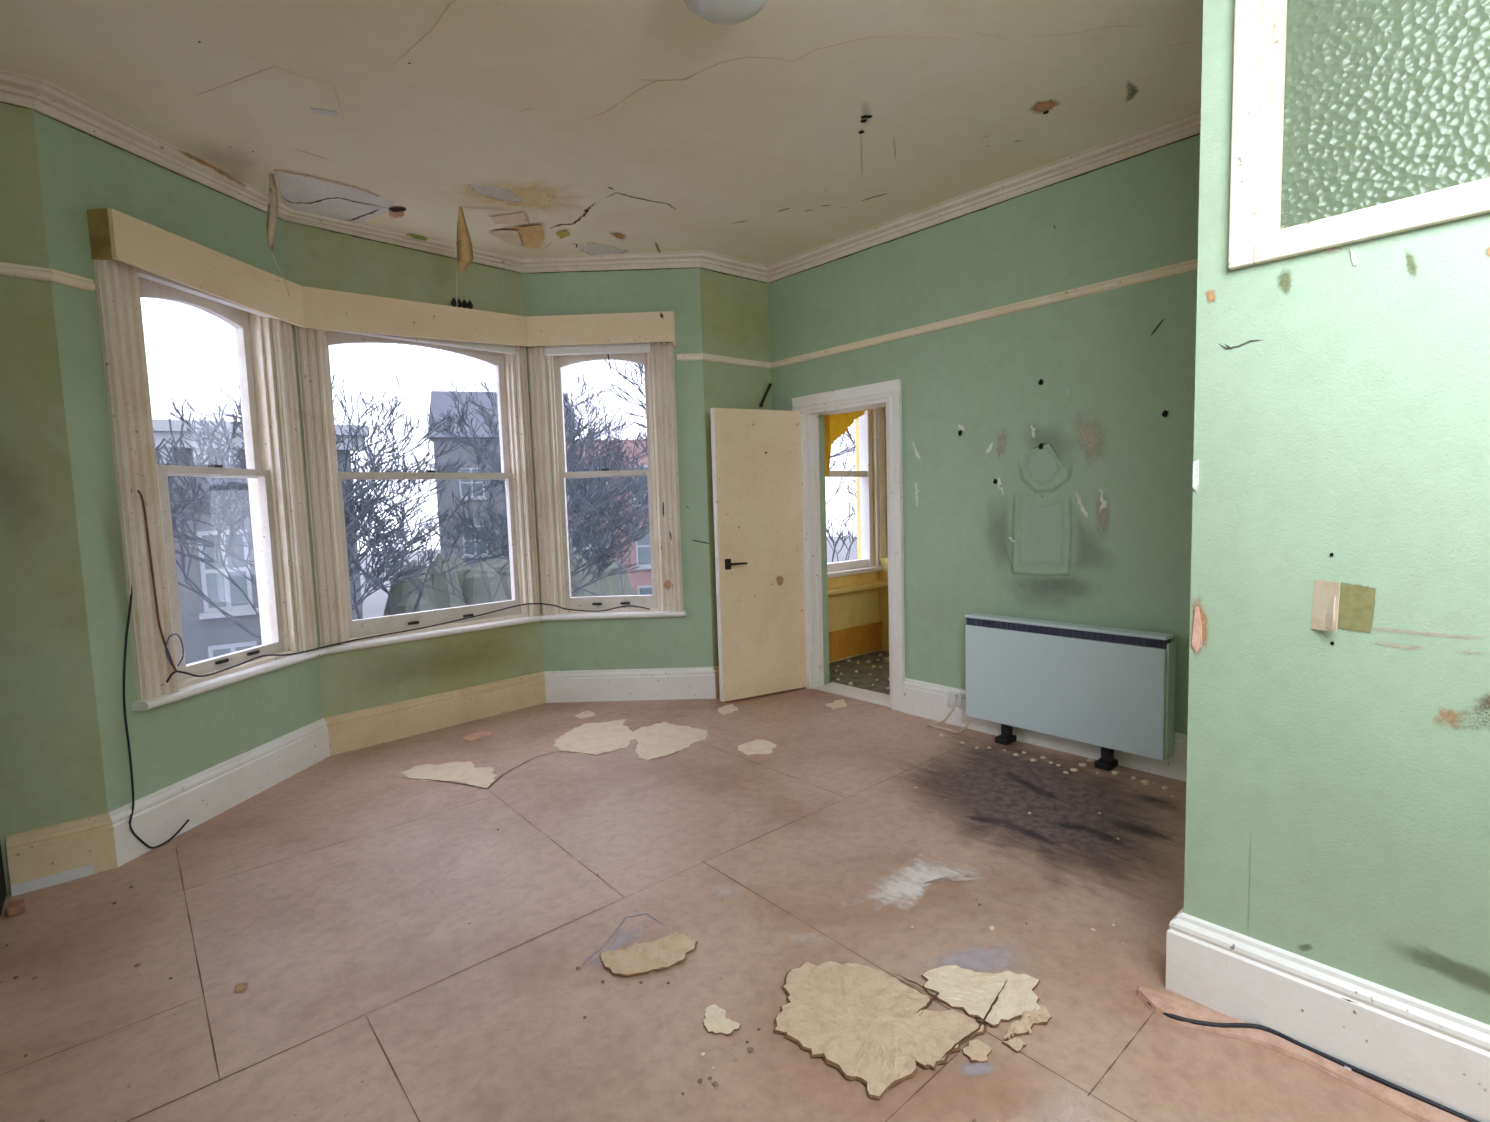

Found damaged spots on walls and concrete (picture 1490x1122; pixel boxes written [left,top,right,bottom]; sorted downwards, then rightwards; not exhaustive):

crack [584,36,897,120]
flaking render [266,170,406,252]
flaking render [456,184,627,272]
peeling [1191,607,1202,653]